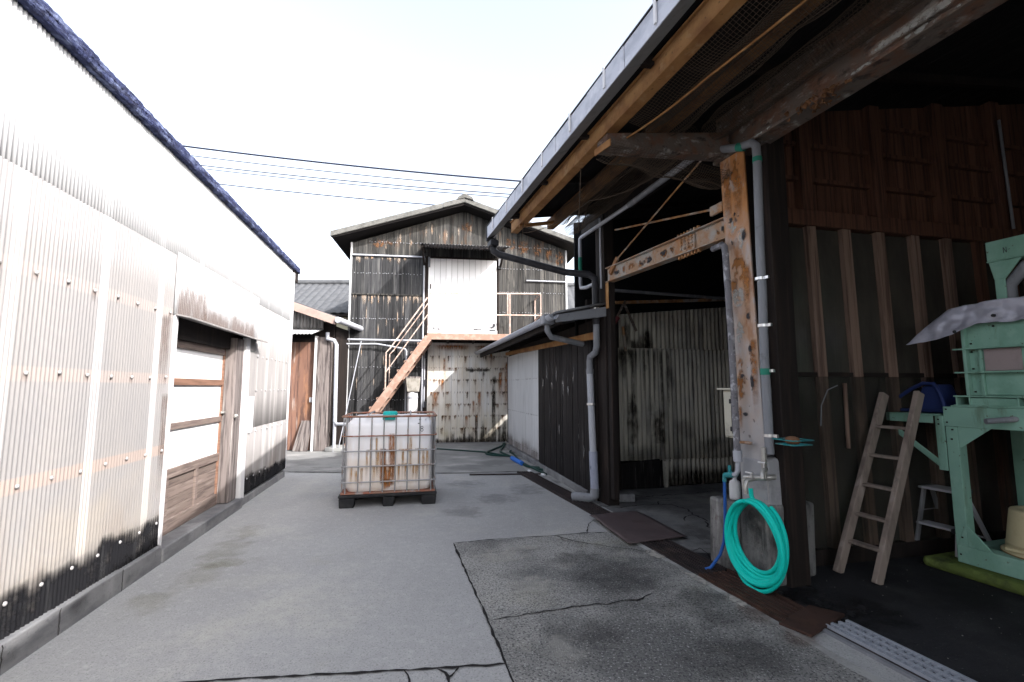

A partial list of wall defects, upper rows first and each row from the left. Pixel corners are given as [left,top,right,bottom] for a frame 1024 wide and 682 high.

rust [731,258,749,299]
rust [430,345,507,431]
water stain [628,395,638,438]
water stain [618,326,669,393]
rust [737,340,757,421]
water stain [0,520,159,640]
crack [183,500,711,682]